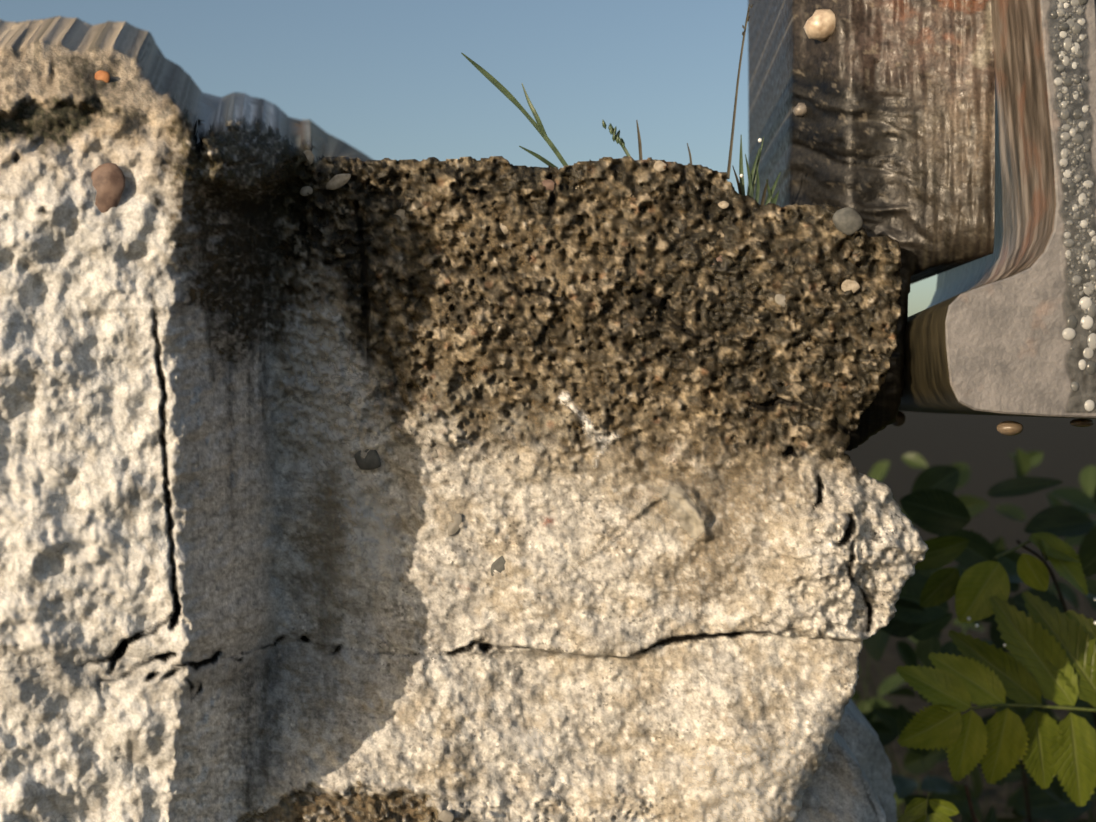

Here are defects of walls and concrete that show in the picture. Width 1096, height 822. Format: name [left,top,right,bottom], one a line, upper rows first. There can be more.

water stain [160,121,903,628]
crack [90,297,242,694]
crack [266,636,309,647]
crack [444,638,526,656]
crack [613,628,795,657]
spalling [237,781,438,822]
spalling [452,811,482,822]